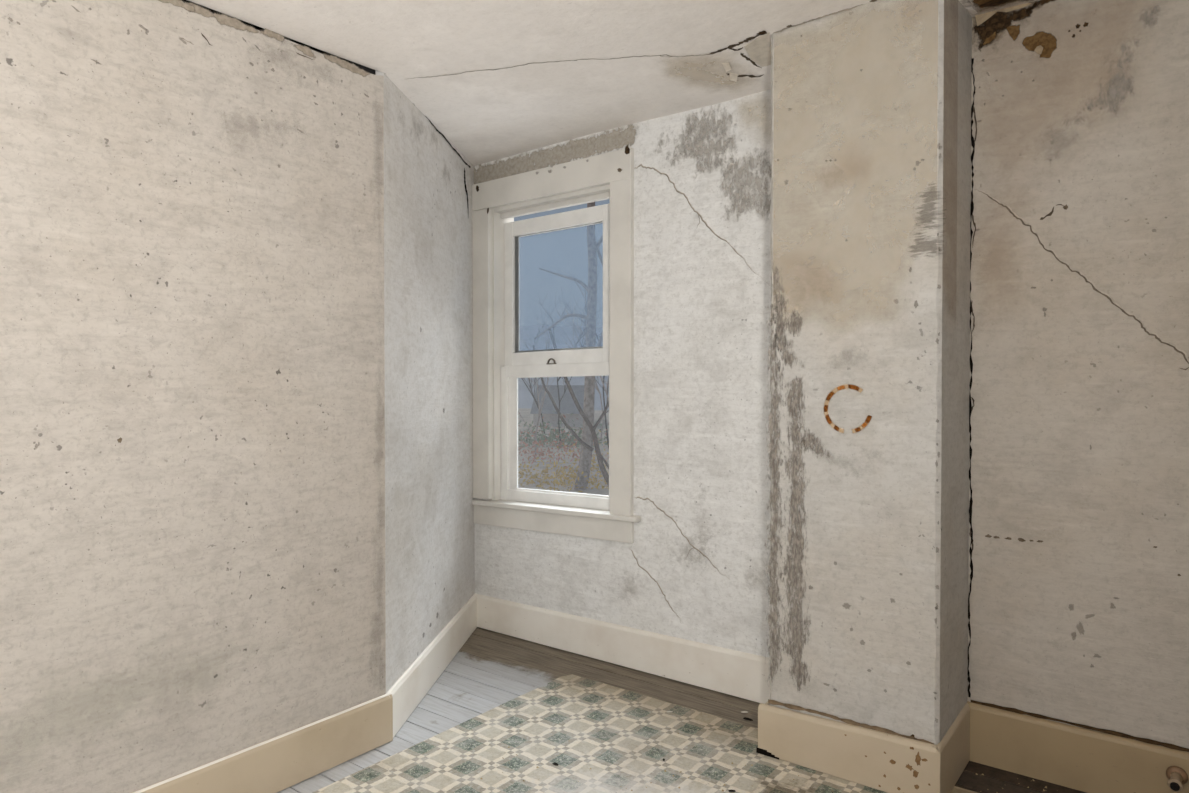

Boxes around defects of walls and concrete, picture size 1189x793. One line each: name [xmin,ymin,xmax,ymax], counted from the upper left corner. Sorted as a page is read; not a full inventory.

crack [774,4,863,33]
flaking render [973,0,1057,58]
crack [410,54,708,79]
crack [635,164,767,283]
rust [824,384,859,431]
crack [967,58,1189,752]
crack [633,496,730,579]
crack [630,549,681,623]